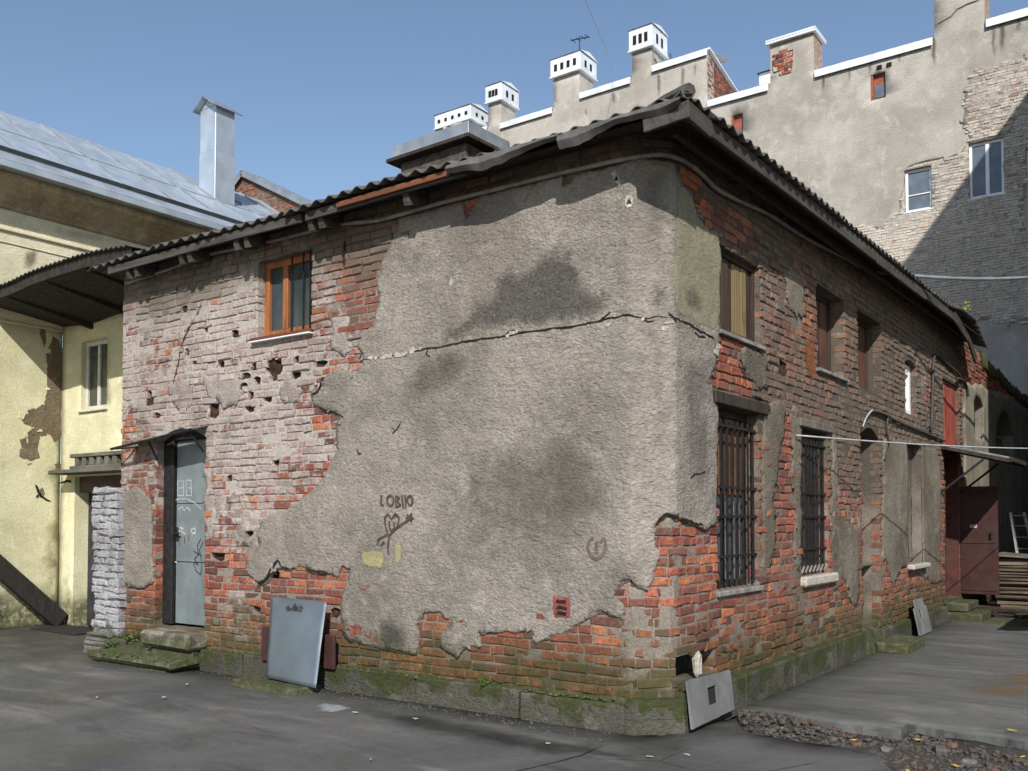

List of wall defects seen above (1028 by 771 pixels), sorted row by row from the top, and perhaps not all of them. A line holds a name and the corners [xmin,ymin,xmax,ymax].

flaking render [853,50,1028,327]
flaking render [18,329,63,465]
spalling [208,404,219,418]
flaking render [241,354,363,512]
leakage [449,258,601,335]
crack [363,312,771,412]
flaking render [770,417,799,582]
flaking render [254,564,371,654]
flaking render [414,513,752,698]